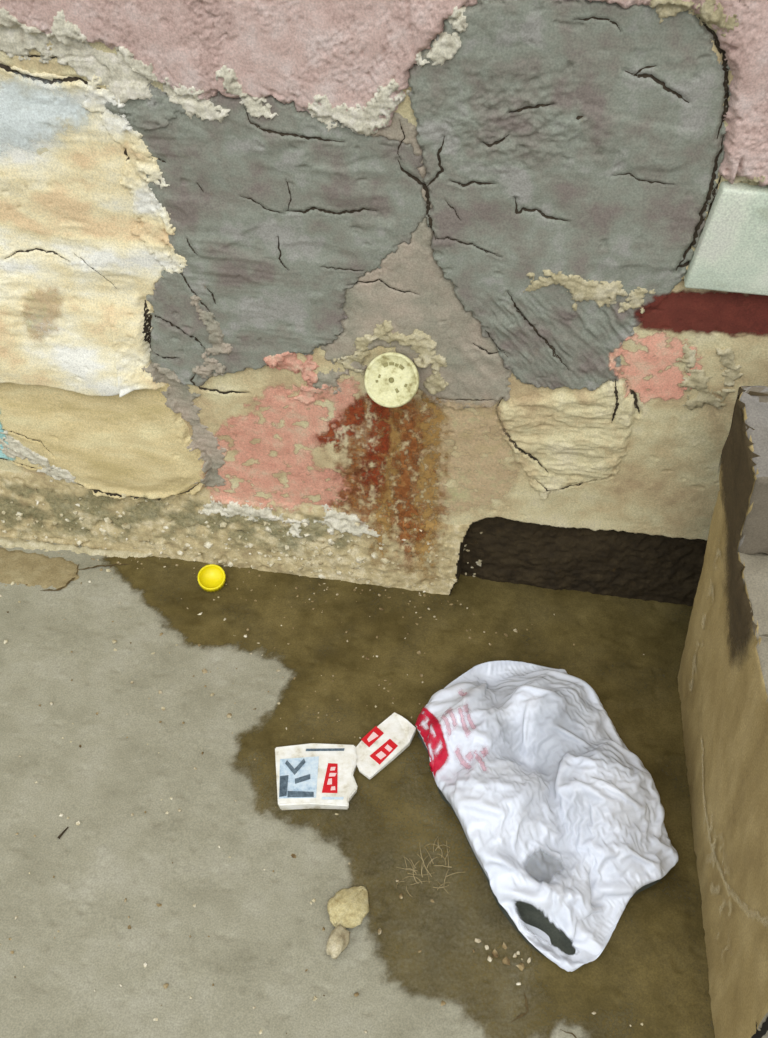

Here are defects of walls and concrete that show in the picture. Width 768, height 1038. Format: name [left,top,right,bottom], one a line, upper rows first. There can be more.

peeling [415,6,468,67]
peeling [649,0,739,37]
peeling [307,78,410,137]
crack [625,65,689,103]
crack [397,123,500,257]
crack [5,248,116,288]
spalling [0,7,384,545]
crack [142,300,247,394]
crack [612,379,640,421]
corrosion [317,392,447,570]
damp [720,387,768,660]
damp [103,556,715,1038]